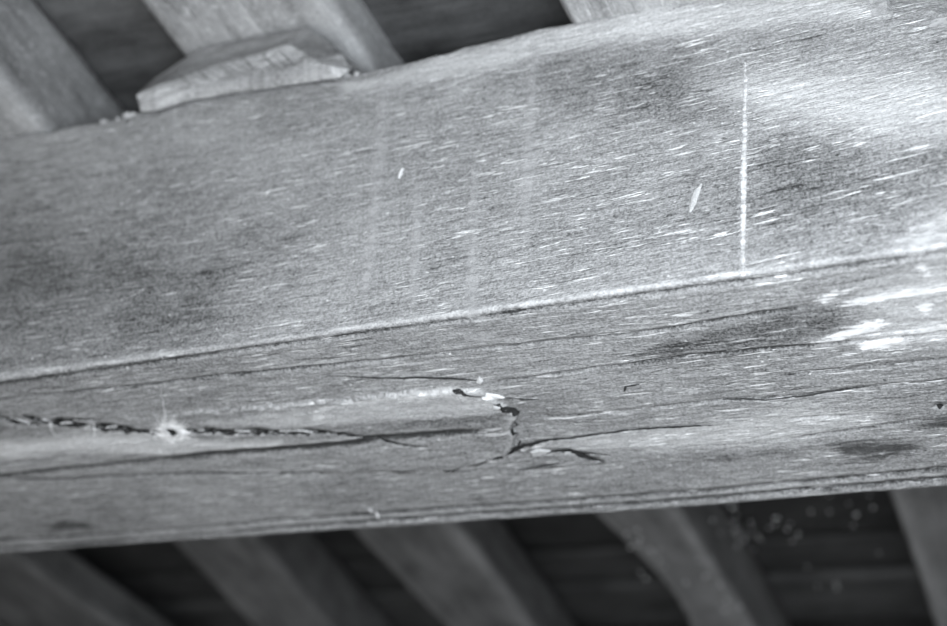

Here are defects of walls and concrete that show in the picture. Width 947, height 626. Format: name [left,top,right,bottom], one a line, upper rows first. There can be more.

crack [327,374,477,382]
crack [0,415,161,439]
crack [184,427,428,447]
crack [445,425,713,472]